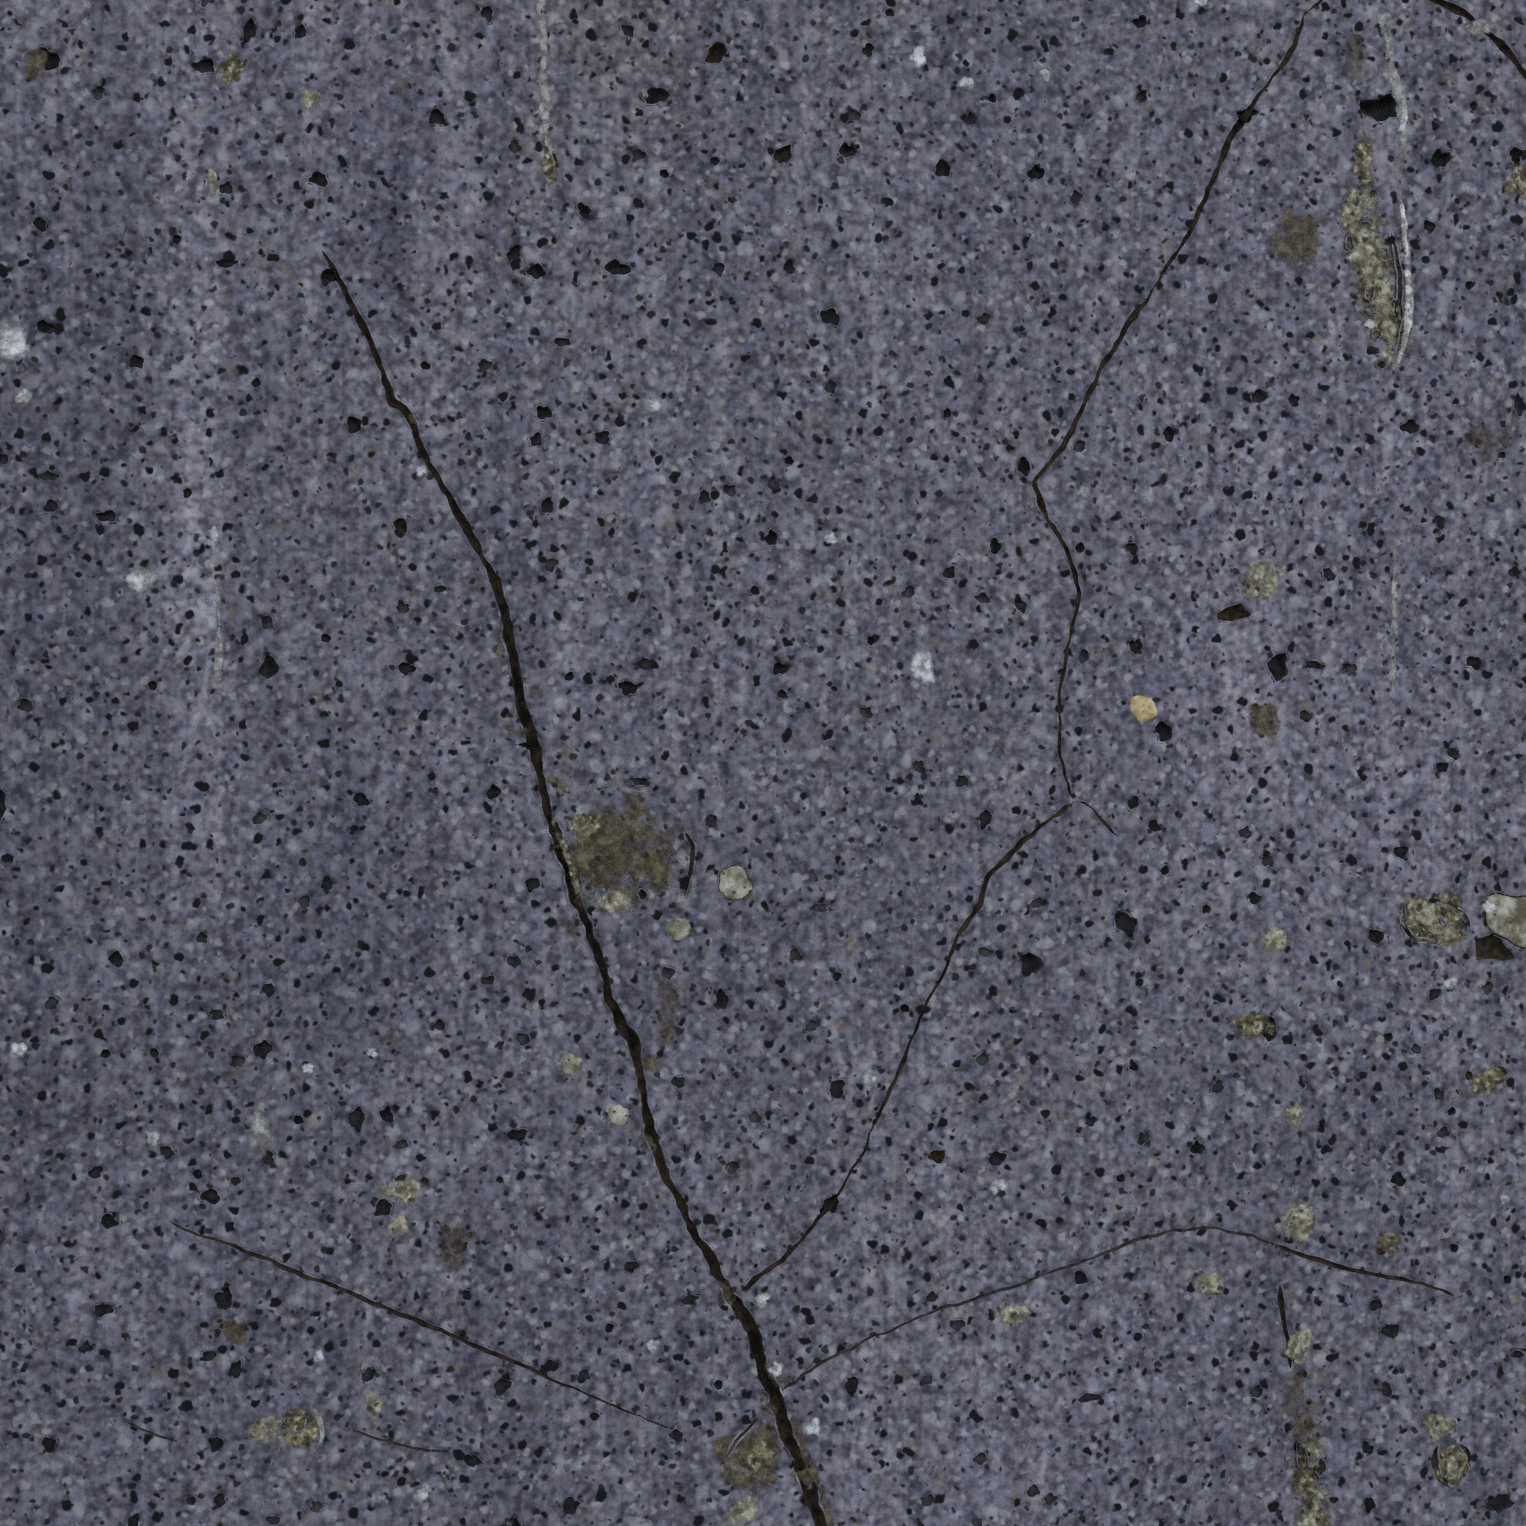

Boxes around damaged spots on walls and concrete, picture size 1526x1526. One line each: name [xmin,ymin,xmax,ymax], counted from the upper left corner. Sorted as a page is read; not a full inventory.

crack [1425,0,1526,83]
crack [1506,148,1526,169]
crack [318,0,1458,1526]
crack [166,1218,690,1437]
crack [120,1418,186,1445]